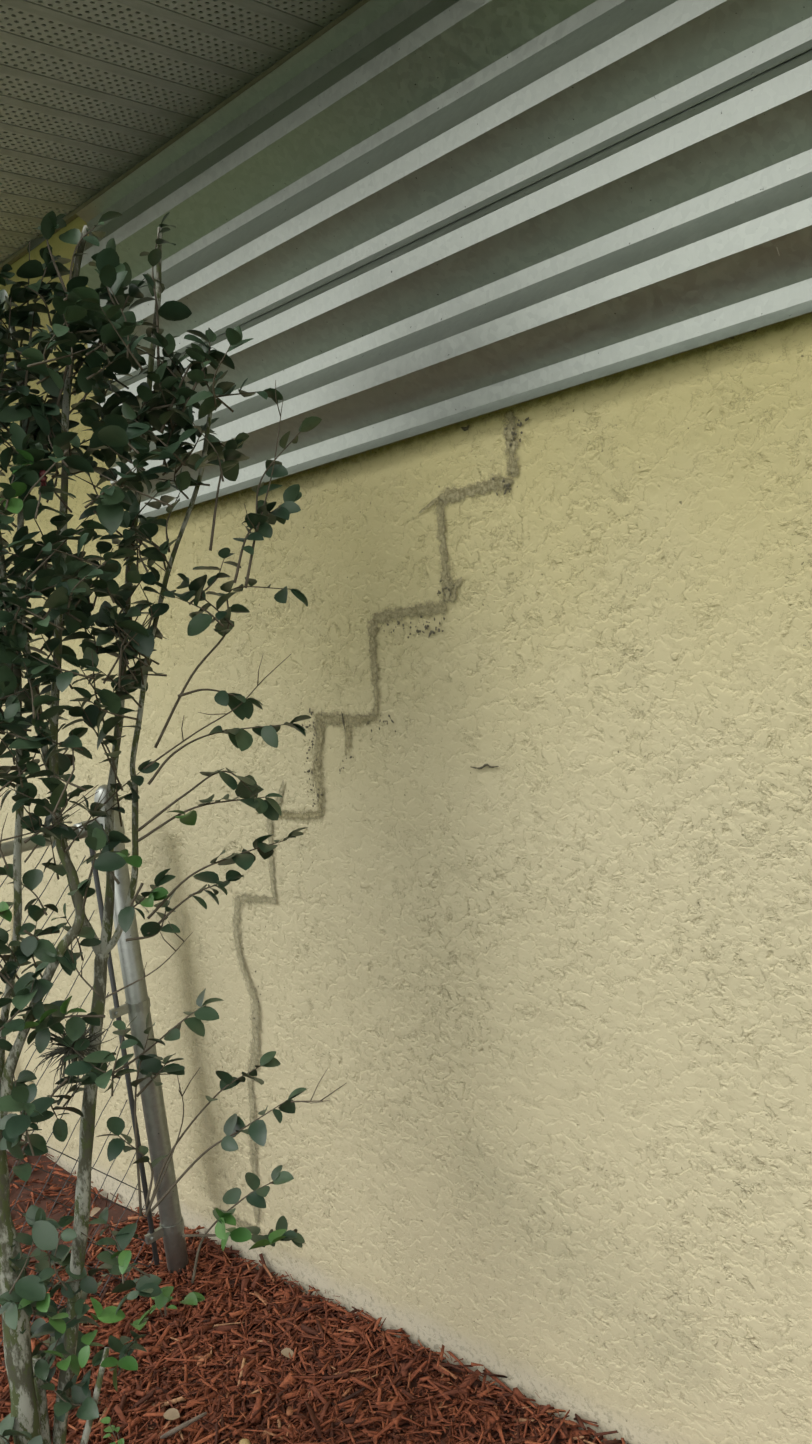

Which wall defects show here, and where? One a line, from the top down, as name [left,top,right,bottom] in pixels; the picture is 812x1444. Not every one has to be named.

crack [214,410,529,1235]